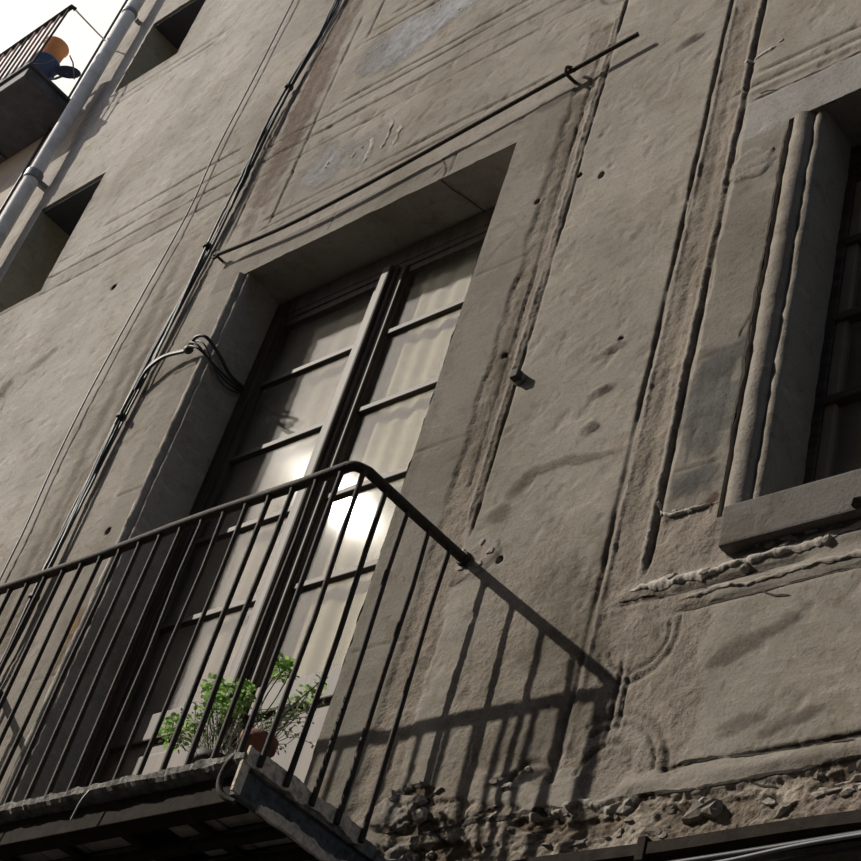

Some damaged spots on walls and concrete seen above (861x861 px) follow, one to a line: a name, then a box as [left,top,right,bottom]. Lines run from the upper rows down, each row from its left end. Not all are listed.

spalling [628,518,861,599]
spalling [386,781,491,861]
spalling [506,795,640,848]
spalling [645,759,861,841]